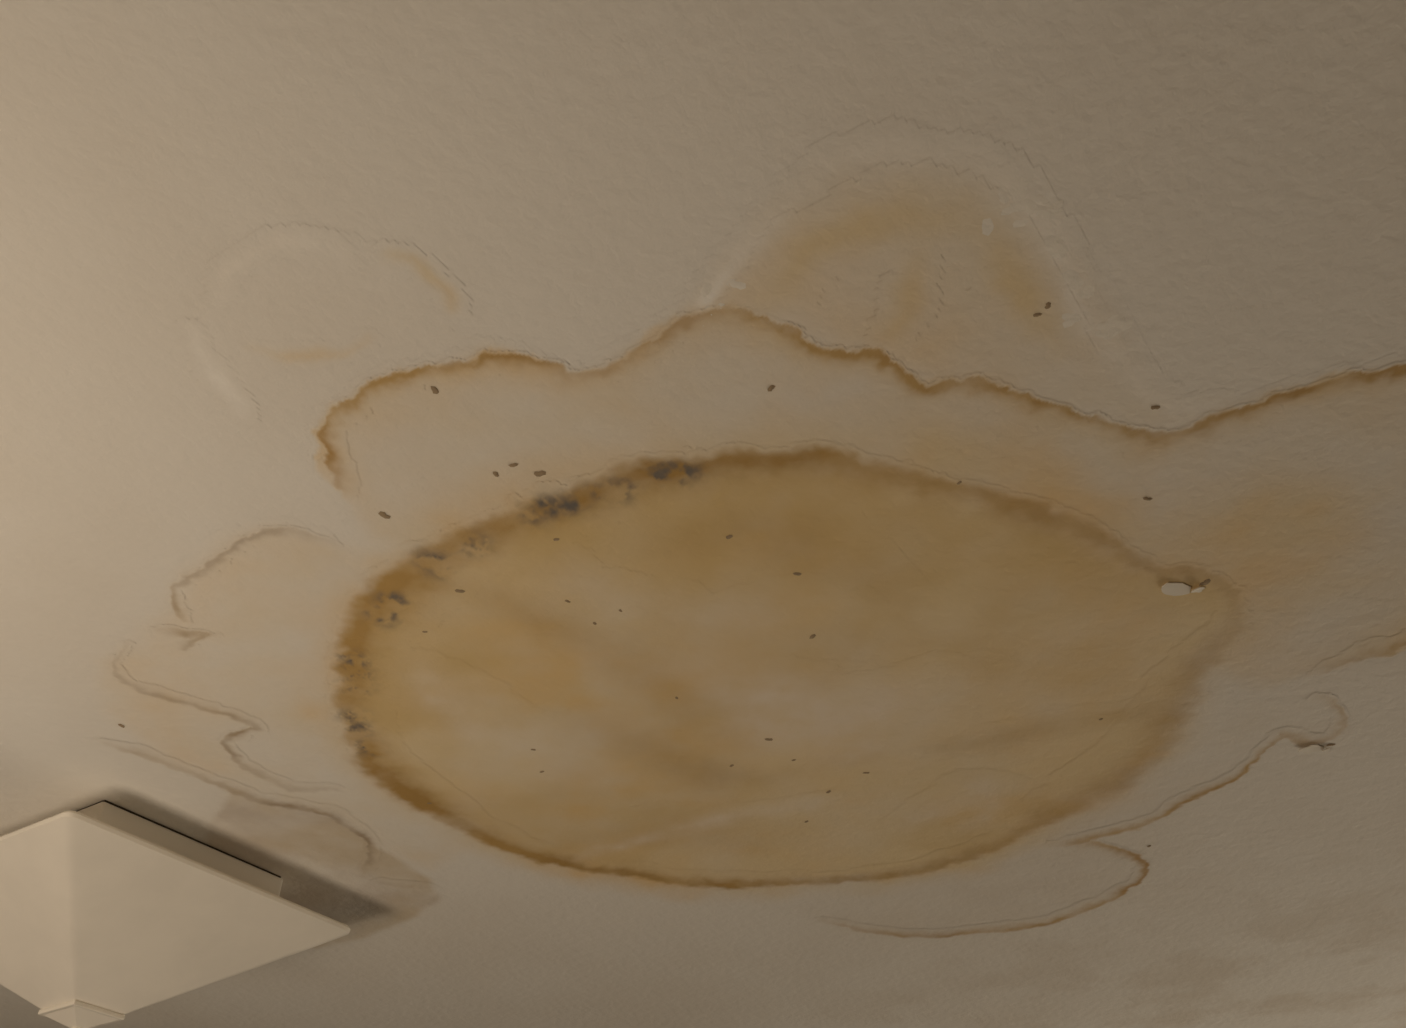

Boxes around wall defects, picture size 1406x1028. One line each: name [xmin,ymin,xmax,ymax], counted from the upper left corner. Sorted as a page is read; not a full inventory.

water stain [85,115,1406,952]
peeling [1161,579,1211,596]